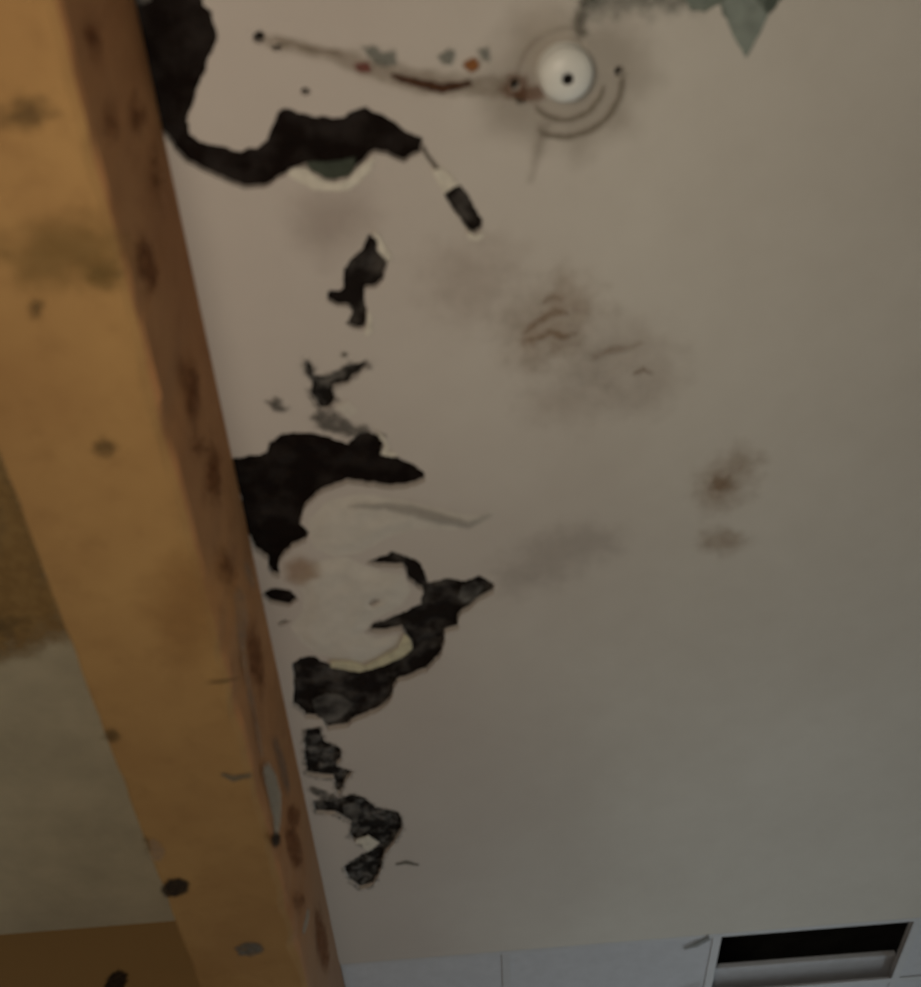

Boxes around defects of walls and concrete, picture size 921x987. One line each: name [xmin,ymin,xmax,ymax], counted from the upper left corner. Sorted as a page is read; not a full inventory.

spalling [135,0,422,192]
corrosion [355,46,488,93]
peeling [633,0,780,57]
spalling [432,168,484,241]
spalling [327,232,392,336]
spalling [232,361,424,573]
spalling [264,588,297,604]
spalling [293,551,493,890]